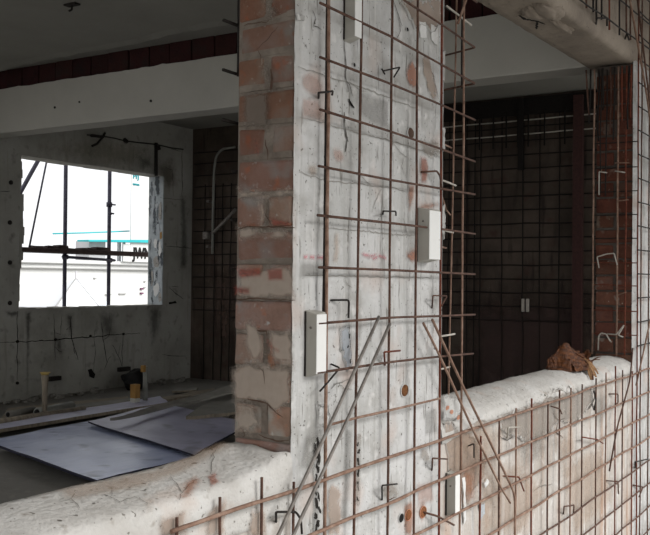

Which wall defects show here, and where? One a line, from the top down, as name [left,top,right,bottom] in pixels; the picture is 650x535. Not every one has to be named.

crack [299,40,437,212]
crack [0,311,137,372]
peeling [148,176,176,305]
spalling [164,0,650,535]